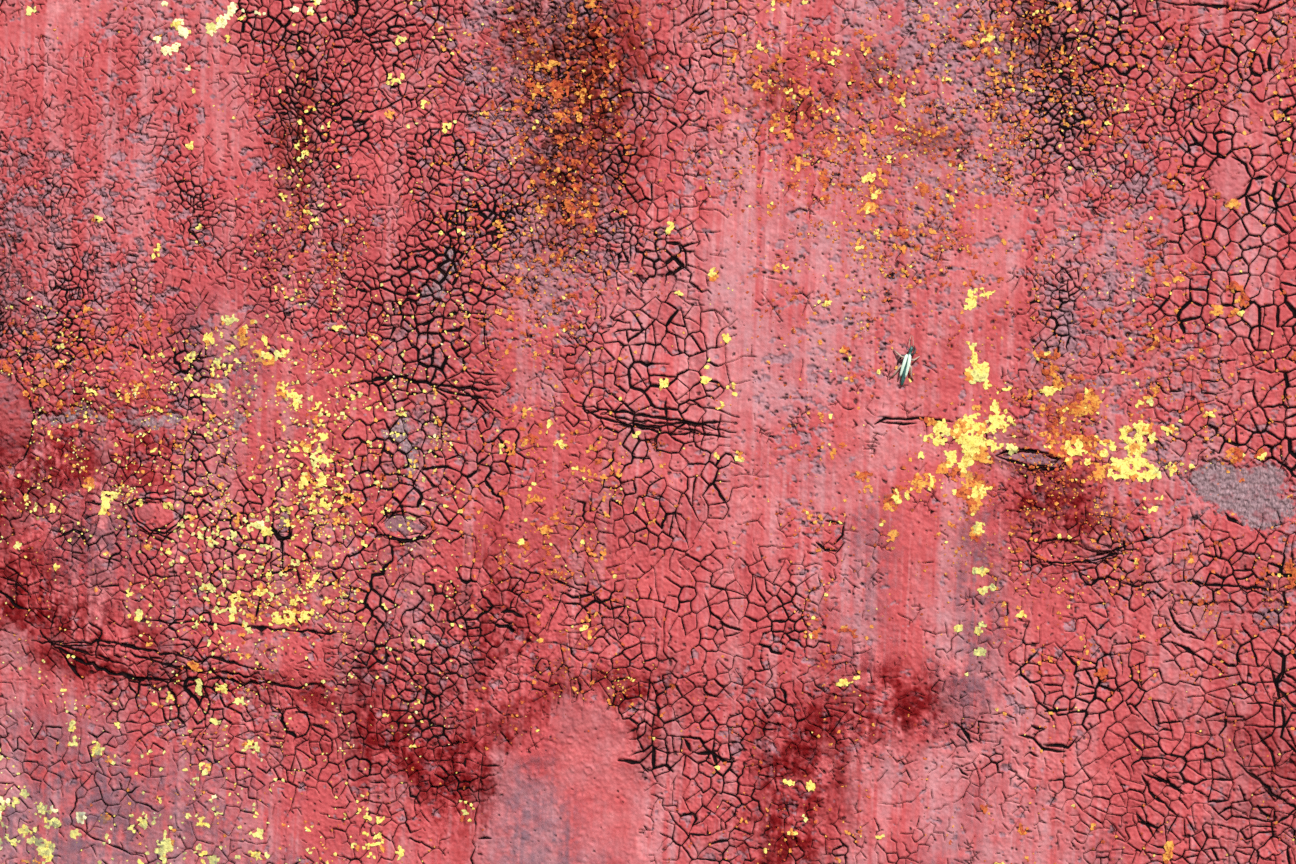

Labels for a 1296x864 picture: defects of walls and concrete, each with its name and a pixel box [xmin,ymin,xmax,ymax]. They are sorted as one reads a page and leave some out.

rust [434,0,1296,426]
peeling [1207,192,1273,214]
rust [782,378,850,477]
rust [758,492,856,569]
spalling [853,237,1296,758]
rust [794,568,891,660]
peeling [802,658,875,770]
peeling [688,762,748,849]
peeling [723,716,841,864]
peeling [841,785,885,843]
peeling [1141,821,1174,864]